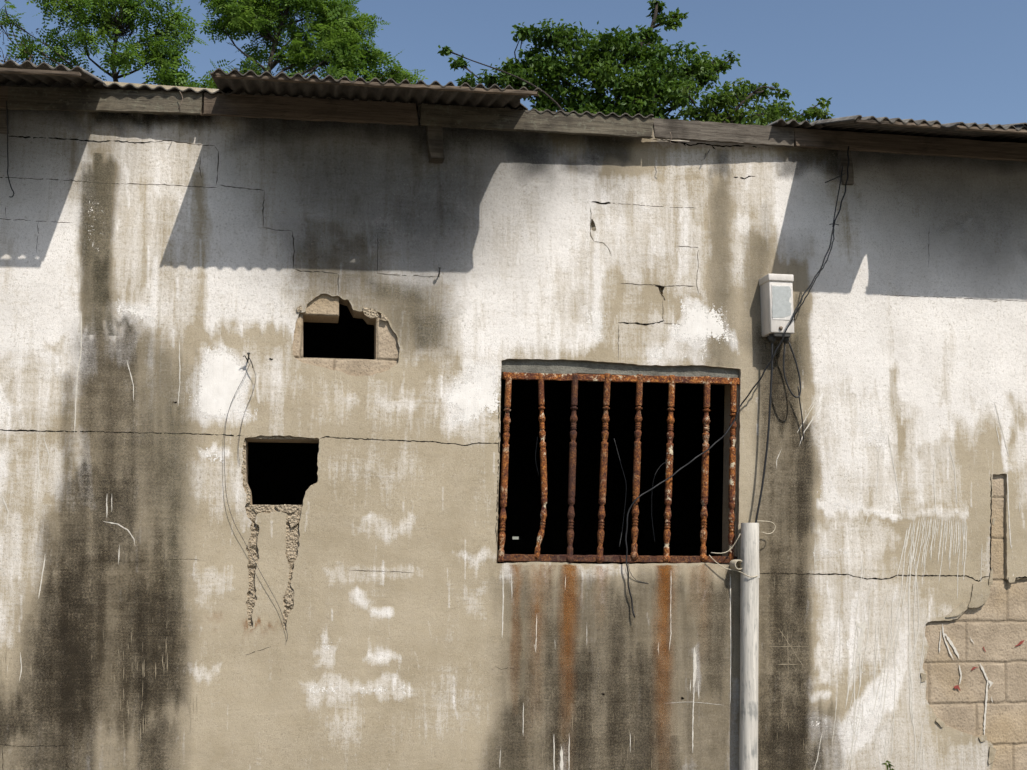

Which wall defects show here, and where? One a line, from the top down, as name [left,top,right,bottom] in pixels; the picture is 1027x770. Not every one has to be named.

damp [82,153,127,336]
spalling [292,294,399,376]
crack [0,428,241,436]
damp [0,517,182,770]
spalling [199,435,319,630]
corrosion [658,565,670,647]
damp [758,337,822,770]
crack [760,477,992,582]
spalling [920,474,1027,770]